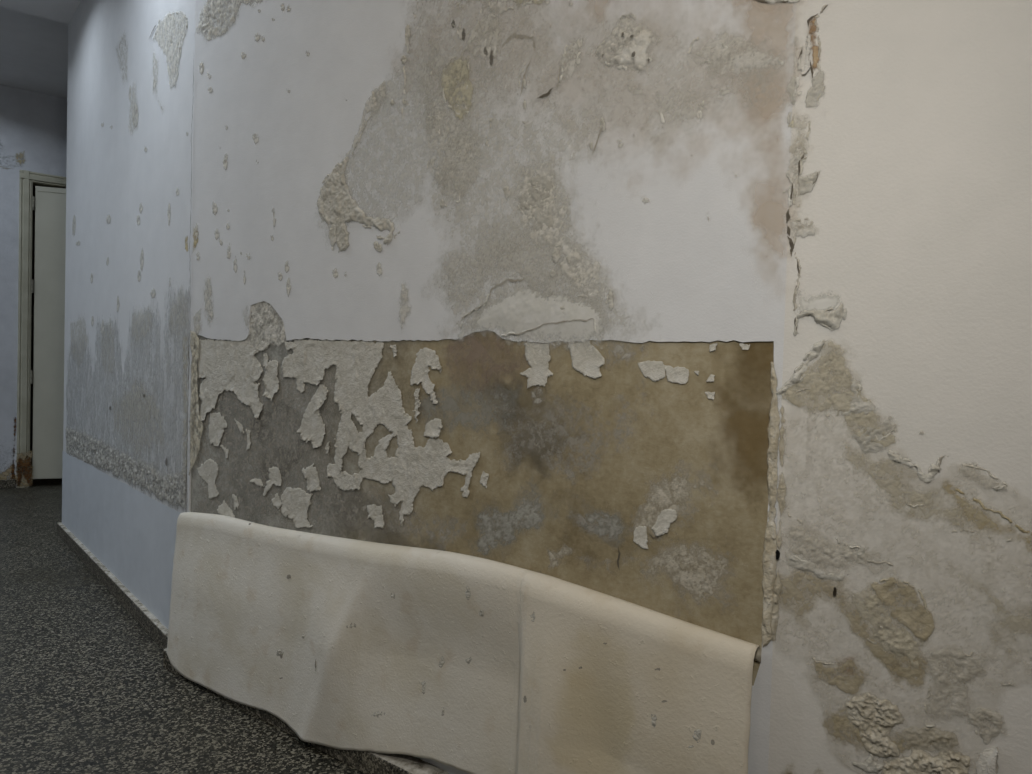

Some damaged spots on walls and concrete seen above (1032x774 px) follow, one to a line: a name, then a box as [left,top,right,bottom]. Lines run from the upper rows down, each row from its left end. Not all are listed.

damp [421,72,614,328]
damp [66,278,213,501]
spalling [191,291,1032,774]
damp [633,461,728,604]